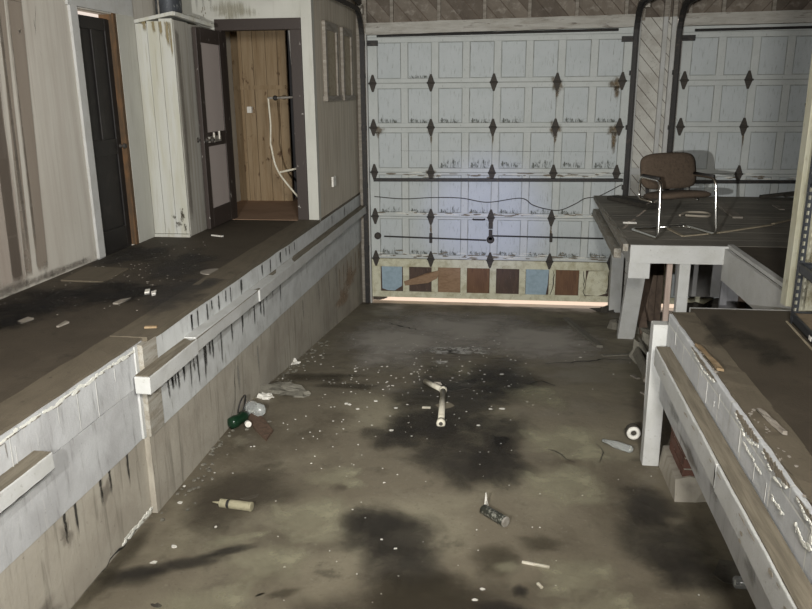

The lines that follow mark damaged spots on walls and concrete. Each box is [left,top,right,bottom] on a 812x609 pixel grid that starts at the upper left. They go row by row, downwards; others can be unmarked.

damp [0,0,48,288]
peeling [0,350,135,446]
spalling [692,347,718,383]
spalling [734,408,799,489]
spalling [101,507,153,573]
peeling [794,494,812,552]